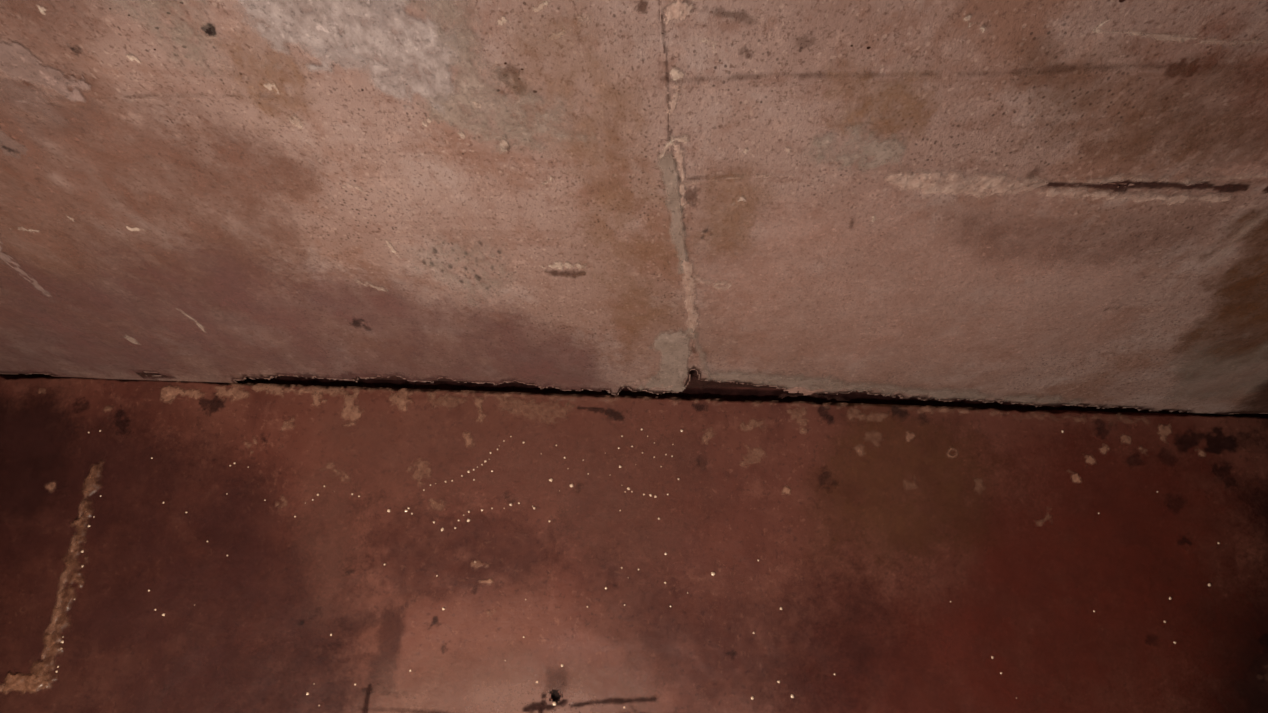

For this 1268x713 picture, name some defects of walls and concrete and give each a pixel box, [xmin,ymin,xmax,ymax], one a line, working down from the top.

damp [240,0,566,146]
crack [663,0,693,24]
damp [0,82,595,391]
crack [660,69,698,335]
crack [1023,180,1268,193]
damp [1186,213,1268,376]
crack [0,367,1268,420]
damp [0,402,342,713]
damp [363,659,641,713]